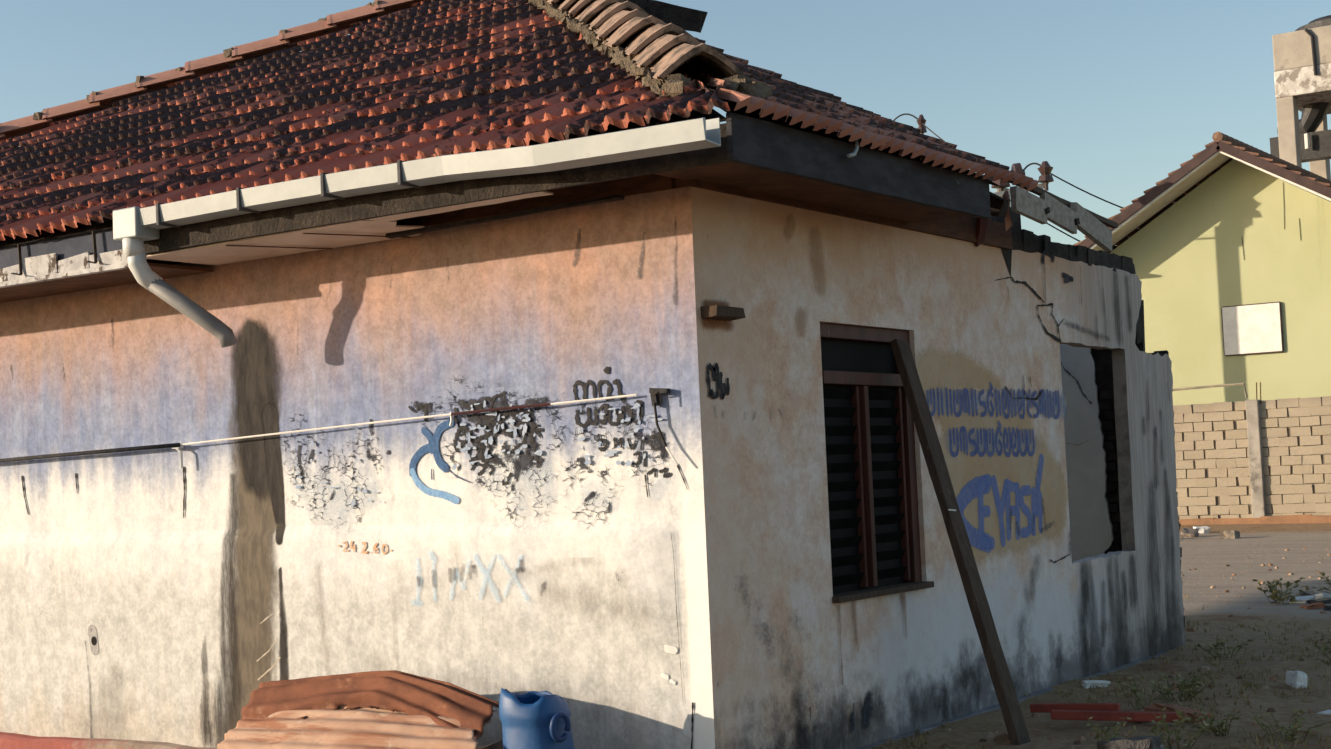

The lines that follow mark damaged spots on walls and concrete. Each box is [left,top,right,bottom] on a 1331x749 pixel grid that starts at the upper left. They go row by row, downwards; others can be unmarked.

crack [995,248,1092,405]
peeling [411,379,669,528]
water stain [201,320,288,746]
water stain [1081,402,1178,677]
water stain [780,691,873,749]